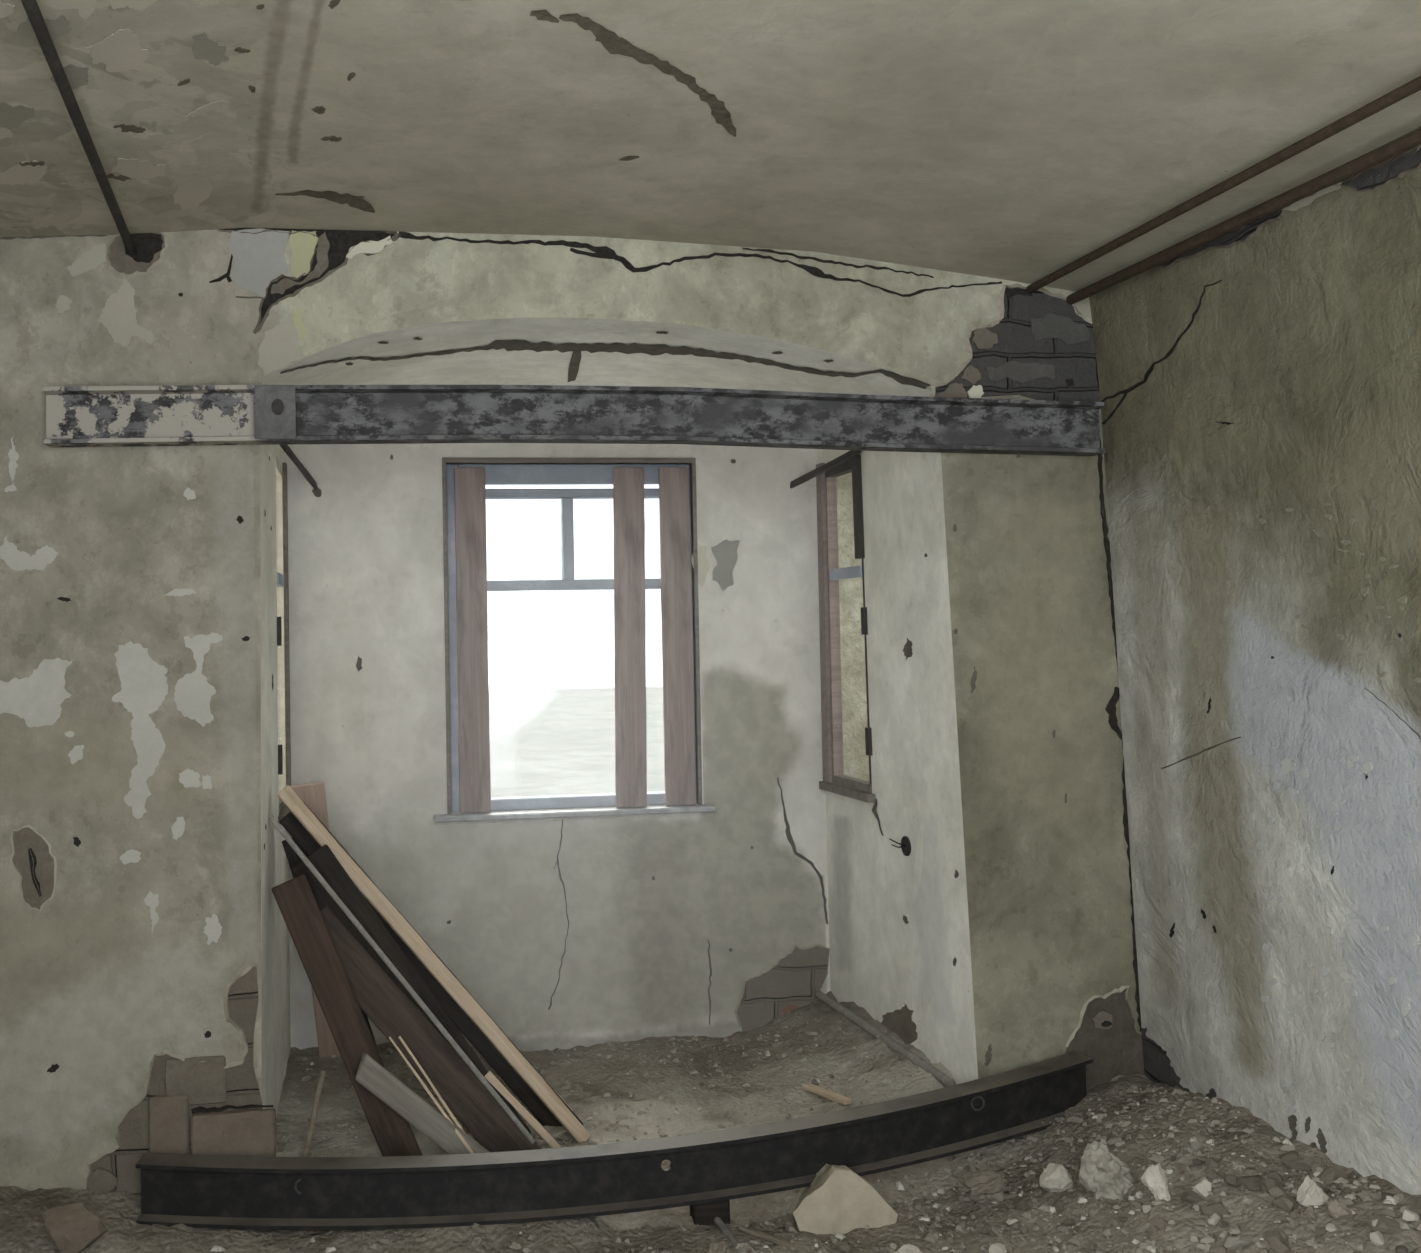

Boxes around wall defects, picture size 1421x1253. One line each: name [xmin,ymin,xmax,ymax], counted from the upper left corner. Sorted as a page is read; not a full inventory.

crack [530,10,736,137]
crack [209,190,1002,334]
crack [280,340,930,389]
flaking render [930,283,1101,402]
peeling [0,658,84,764]
peeling [112,633,223,819]
crack [1098,280,1222,1032]
water stain [957,354,1421,1095]
flaking render [734,944,830,1032]
crack [777,777,828,925]
water stain [892,808,968,1034]
flaking render [83,965,276,1192]